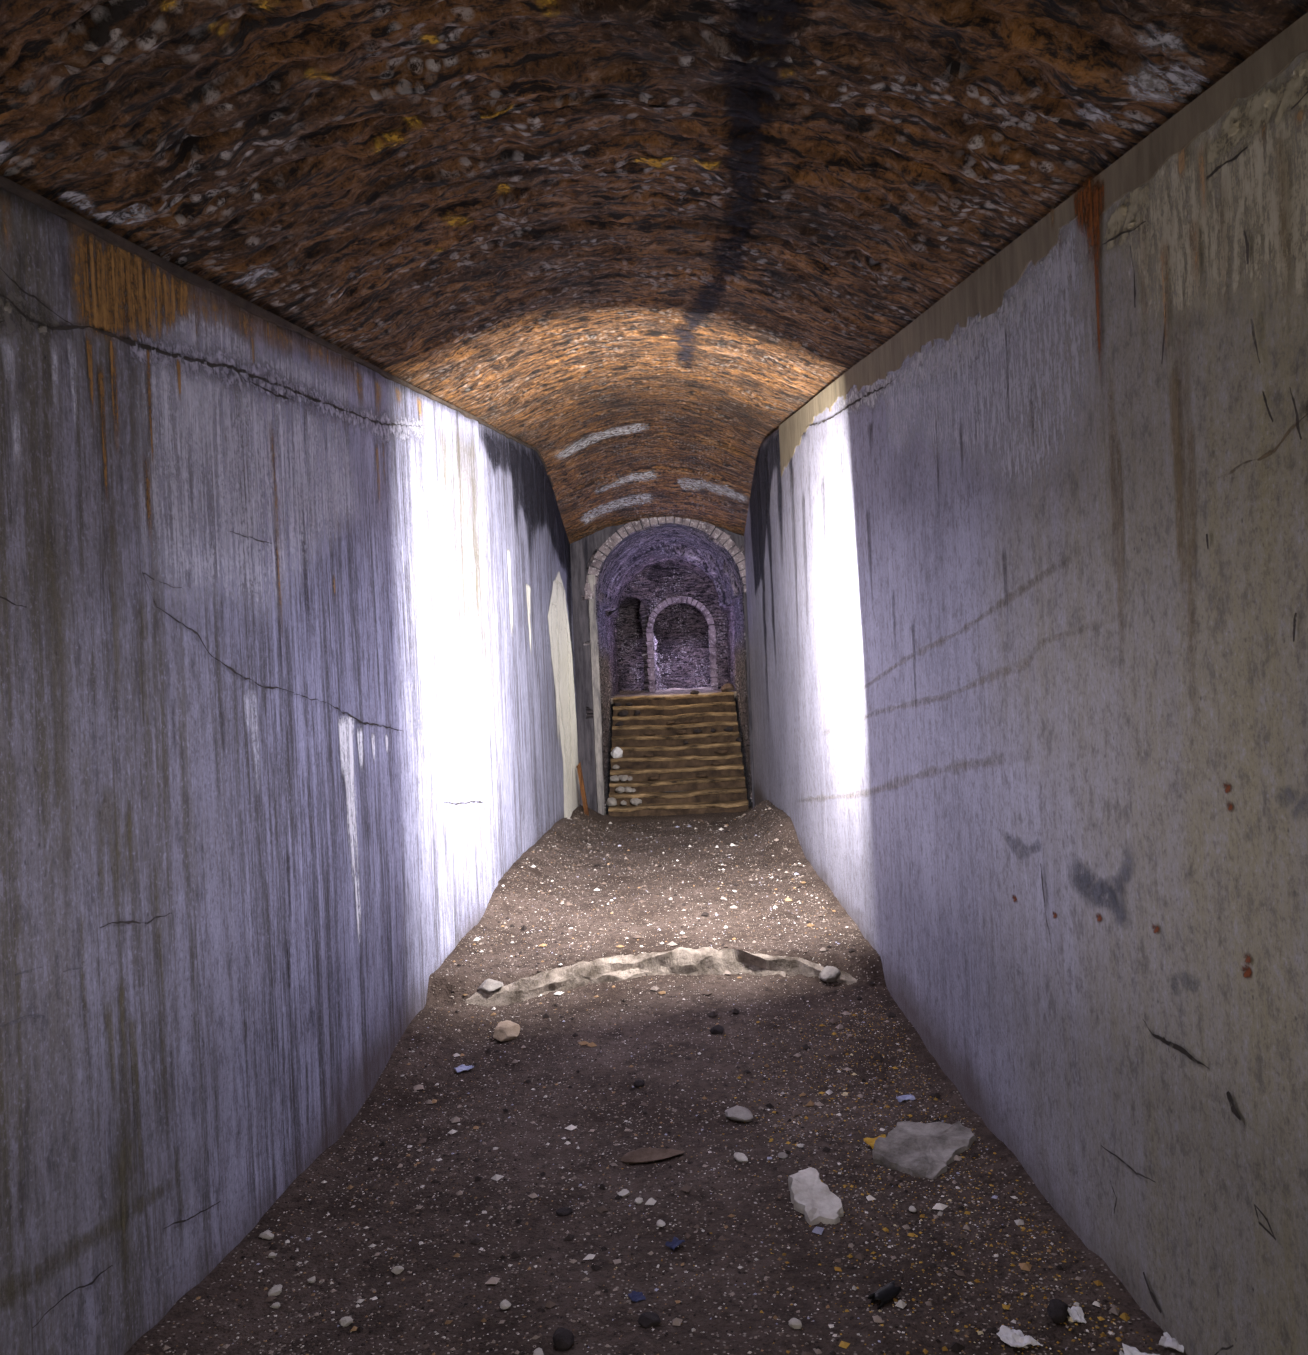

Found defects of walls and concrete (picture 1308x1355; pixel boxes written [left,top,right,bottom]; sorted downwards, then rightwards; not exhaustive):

rust [70,225,188,527]
crack [0,267,421,428]
leakage [151,314,355,615]
rust [272,432,281,604]
leakage [673,0,810,368]
rust [1074,178,1104,369]
crack [1231,321,1307,473]
leakage [246,697,258,763]
crack [142,572,402,731]
leakage [440,423,656,818]
leakage [338,717,388,937]